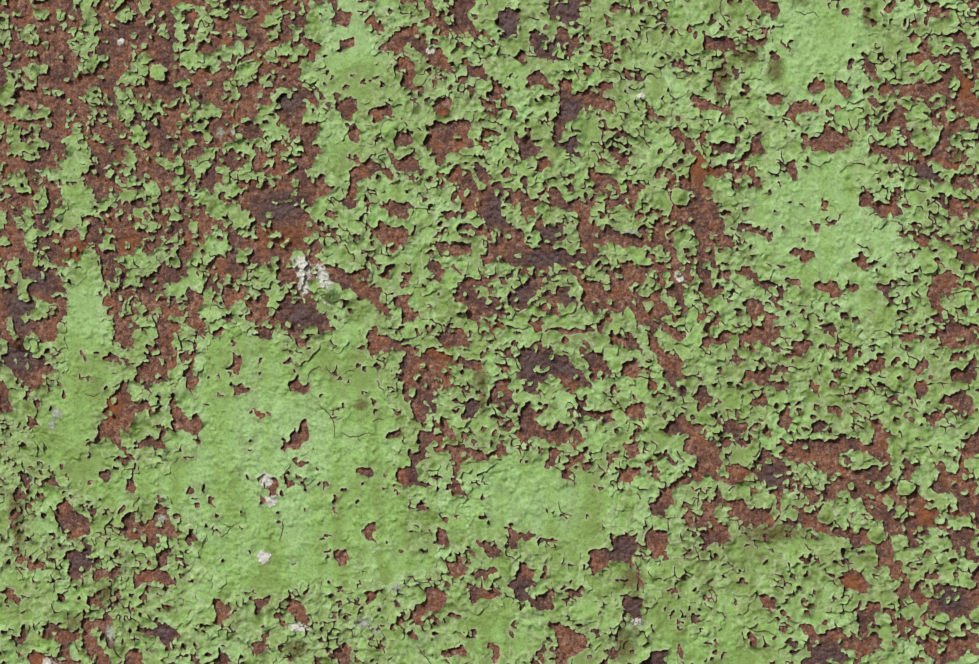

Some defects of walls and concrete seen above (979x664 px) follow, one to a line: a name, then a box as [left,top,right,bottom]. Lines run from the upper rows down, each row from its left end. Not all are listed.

peeling [513,0,683,94]
peeling [765,72,860,163]
corrosion [959,75,972,98]
corrosion [691,154,712,180]
corrosion [68,242,87,262]
corrosion [267,228,297,245]
peeling [834,0,979,432]
corrosion [426,345,450,361]
corrosion [105,393,120,414]
peeling [0,439,244,664]
peeling [377,511,584,640]
peeling [194,580,386,664]